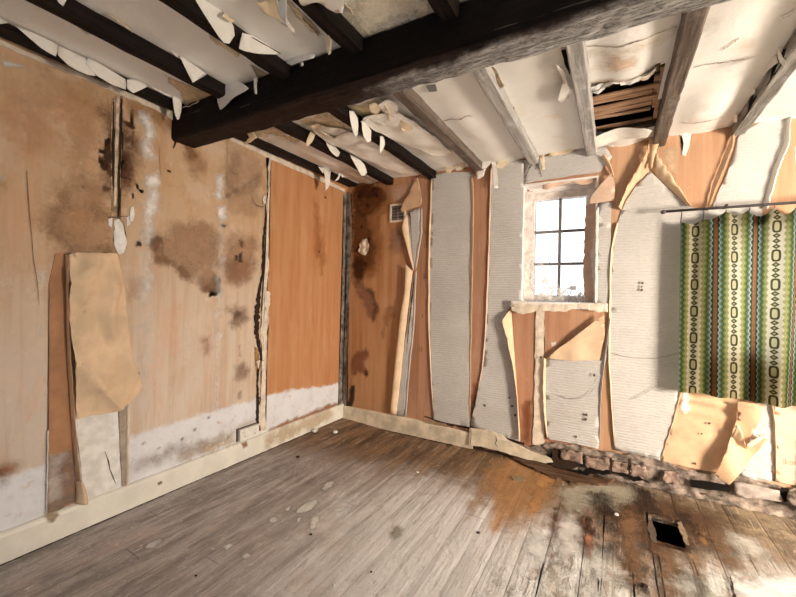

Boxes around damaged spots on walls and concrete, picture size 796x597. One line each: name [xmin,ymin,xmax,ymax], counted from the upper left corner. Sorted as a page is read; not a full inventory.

damp [145,175,160,234]
damp [155,223,256,291]
damp [347,170,409,319]
crack [245,158,272,433]
damp [352,350,368,376]